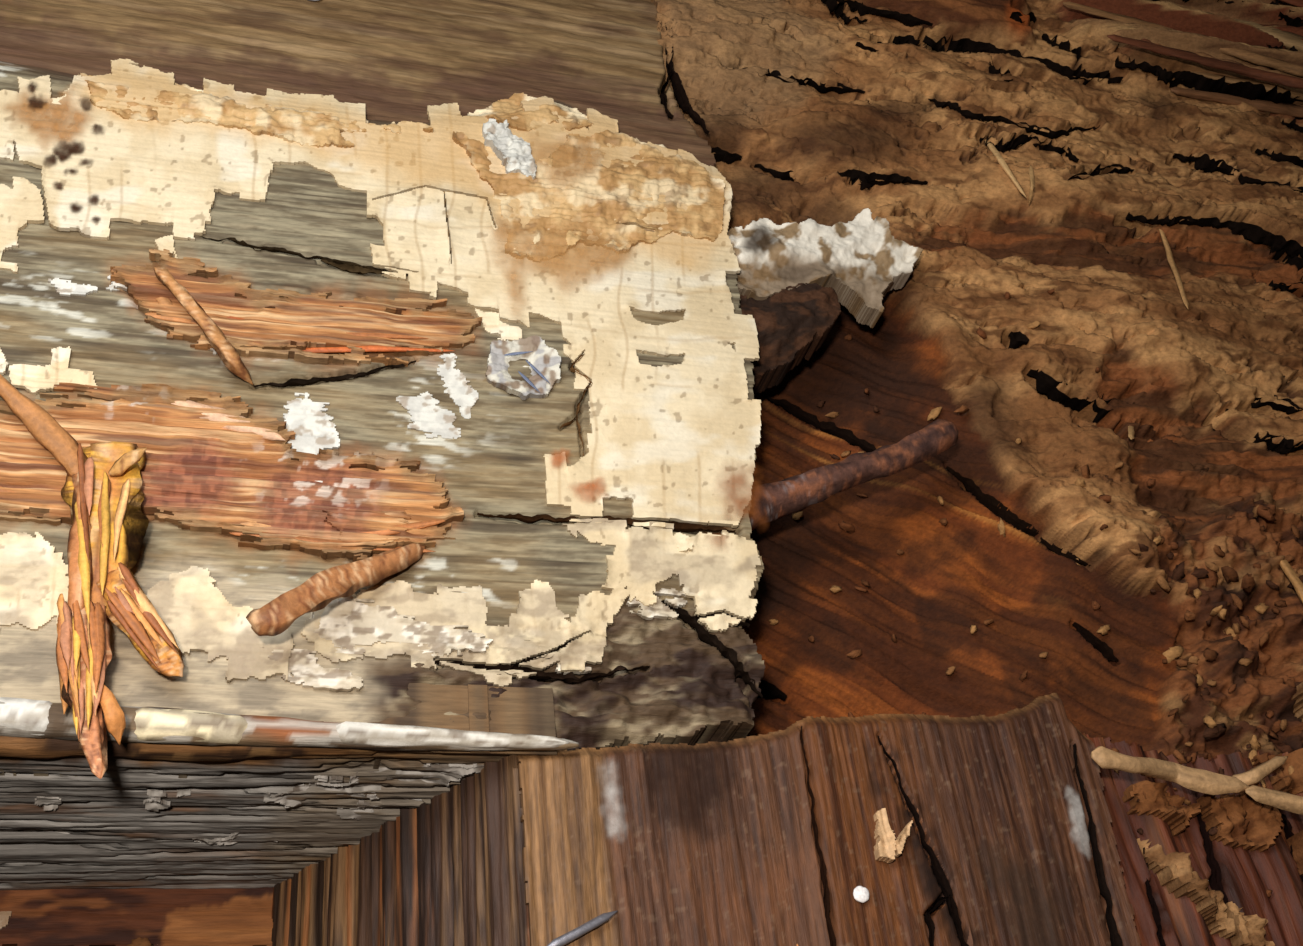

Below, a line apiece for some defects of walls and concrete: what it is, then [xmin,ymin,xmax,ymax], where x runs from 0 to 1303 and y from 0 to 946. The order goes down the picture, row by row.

crack [660,27,795,182]
crack [742,67,865,94]
crack [821,0,1303,193]
crack [1125,212,1303,293]
peeling [0,58,761,692]
crack [1008,331,1134,424]
crack [1225,395,1303,455]
crack [945,466,1091,566]
crack [653,593,787,701]
peeling [0,697,52,739]
peeling [134,707,248,744]
peeling [263,721,569,820]